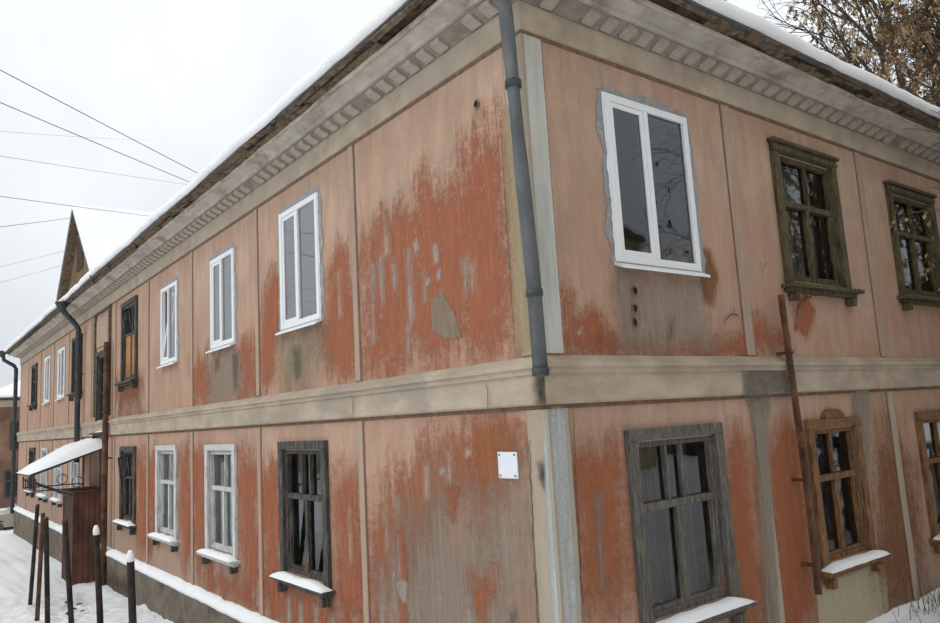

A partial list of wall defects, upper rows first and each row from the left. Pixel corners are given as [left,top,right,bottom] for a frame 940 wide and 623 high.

peeling [321,100,516,383]
peeling [179,412,529,623]